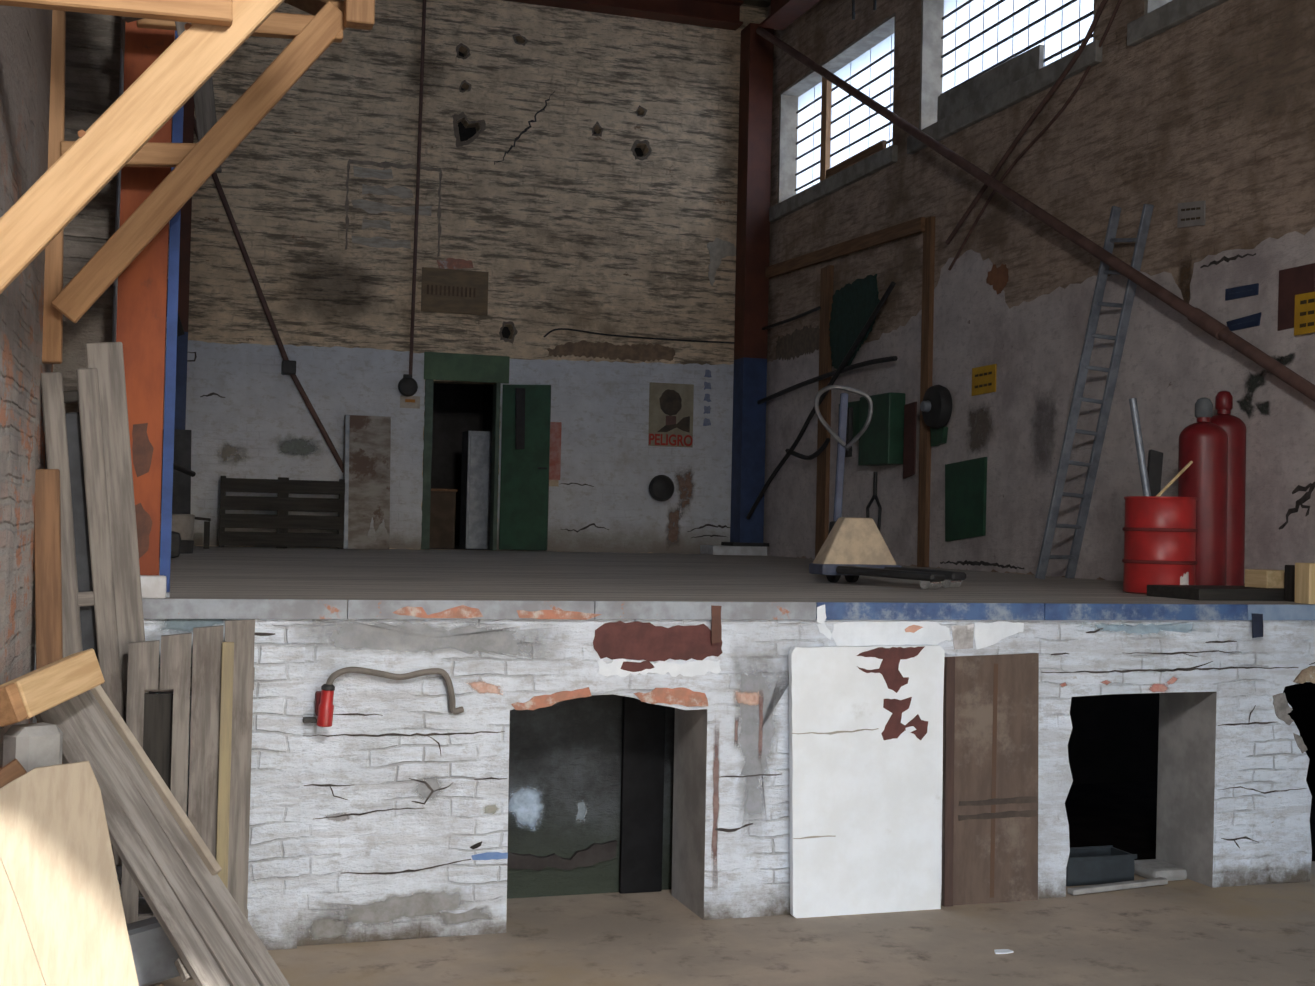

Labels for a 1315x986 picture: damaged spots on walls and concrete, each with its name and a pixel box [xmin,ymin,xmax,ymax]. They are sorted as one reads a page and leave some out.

spalling [452,112,486,148]
crack [494,91,555,165]
spalling [986,264,1009,295]
crack [1279,482,1315,530]
peeling [593,621,723,672]
spalling [511,687,592,710]
spalling [633,687,708,707]
spalling [1273,666,1315,753]
crack [312,713,505,754]
crack [304,777,507,819]
crack [344,859,471,875]
damp [310,891,490,939]